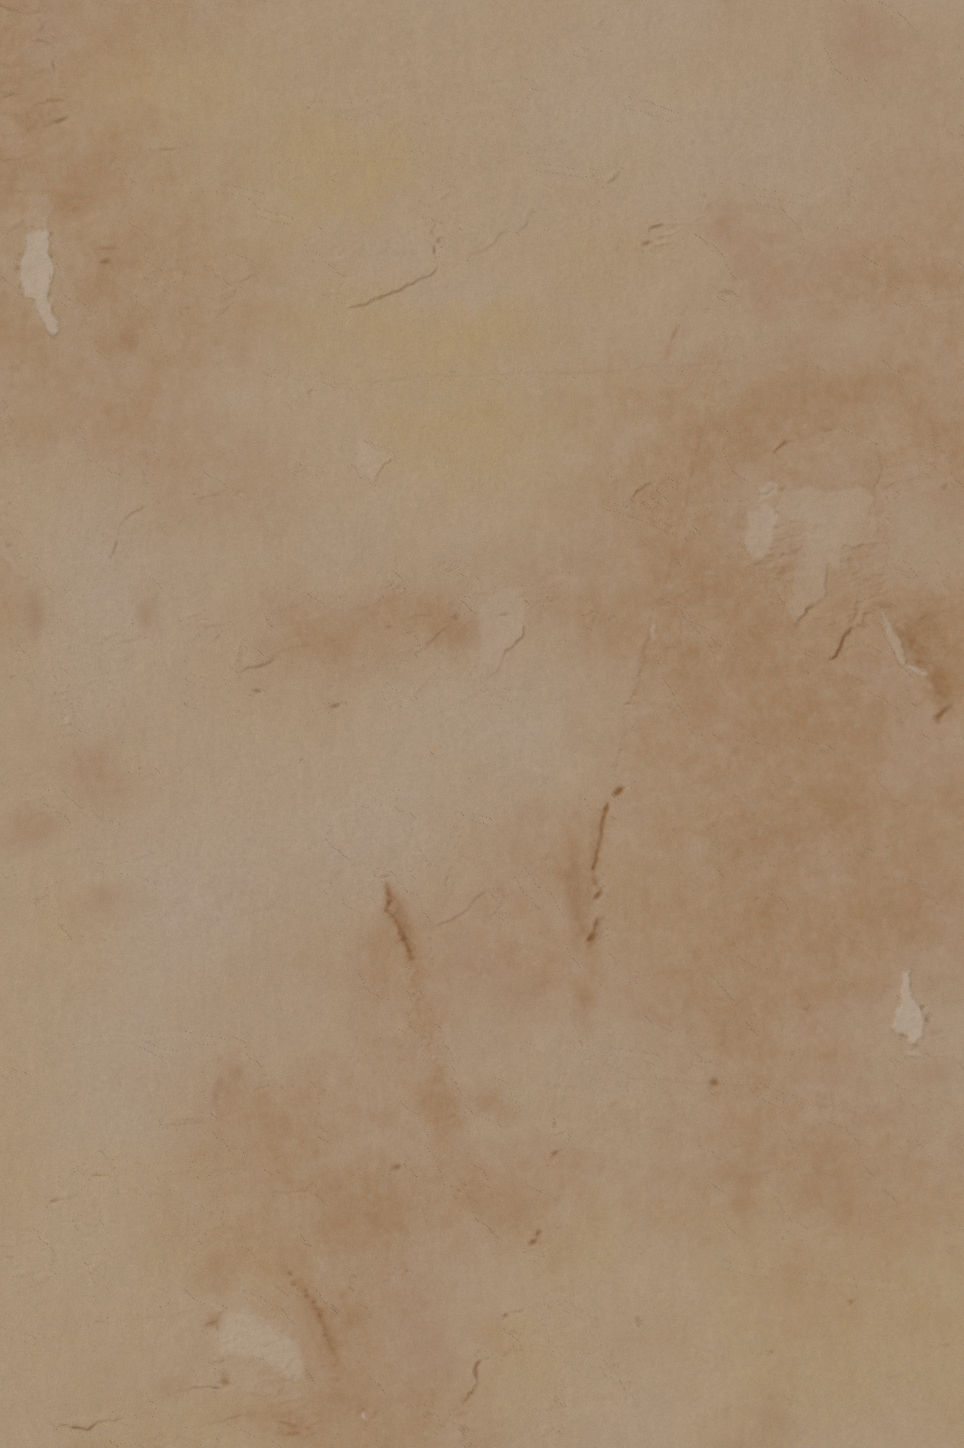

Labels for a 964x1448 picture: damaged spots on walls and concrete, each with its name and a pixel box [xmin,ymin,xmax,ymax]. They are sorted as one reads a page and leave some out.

peeling [2,193,63,339]
leakage [723,360,904,480]
leakage [707,725,899,877]
peeling [889,969,944,1071]